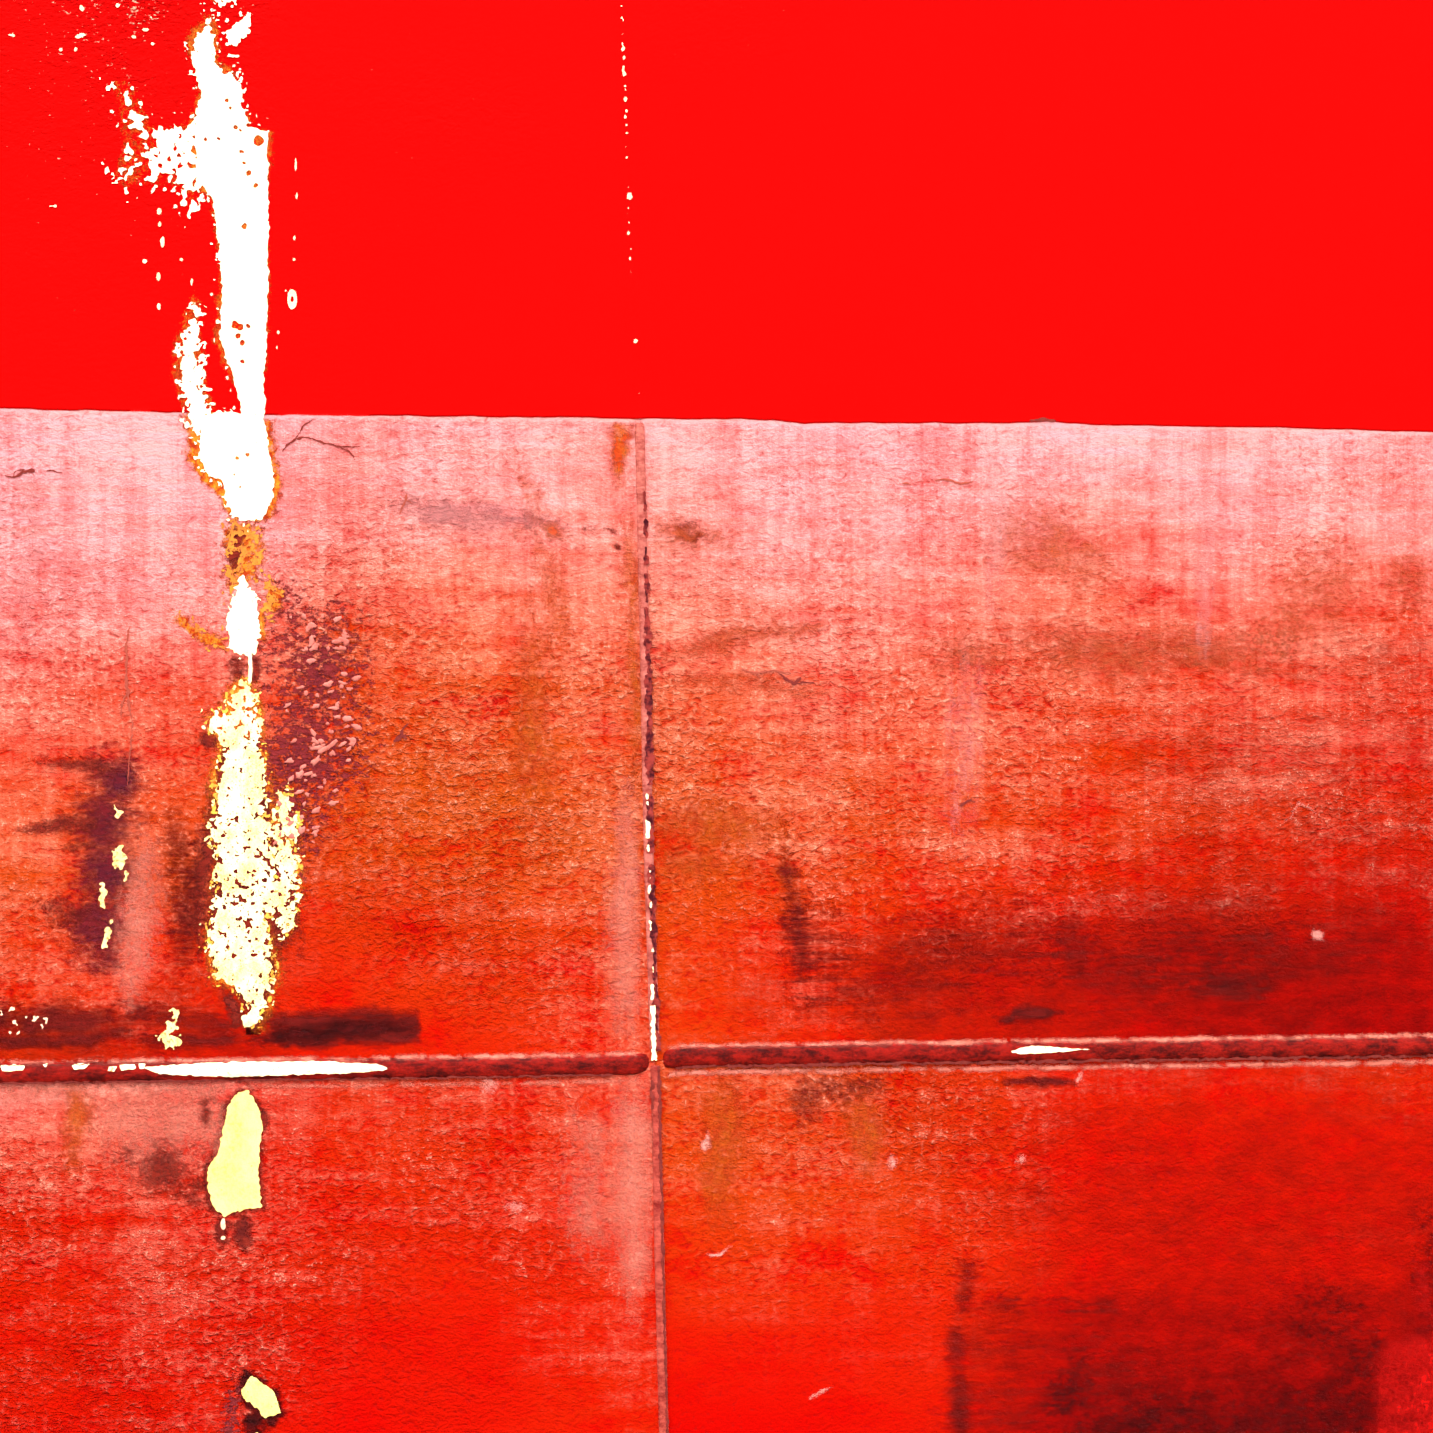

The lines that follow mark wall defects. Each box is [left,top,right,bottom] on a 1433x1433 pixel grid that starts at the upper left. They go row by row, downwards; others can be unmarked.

peeling [99,0,297,532]
corrosion [170,513,285,682]
water stain [19,758,140,972]
water stain [166,832,198,953]
corrosion [199,731,218,748]
peeling [184,575,307,1034]
spalling [1,1064,25,1072]
peeling [108,1008,387,1250]
spalling [1012,1046,1088,1054]
peeling [219,1370,286,1433]